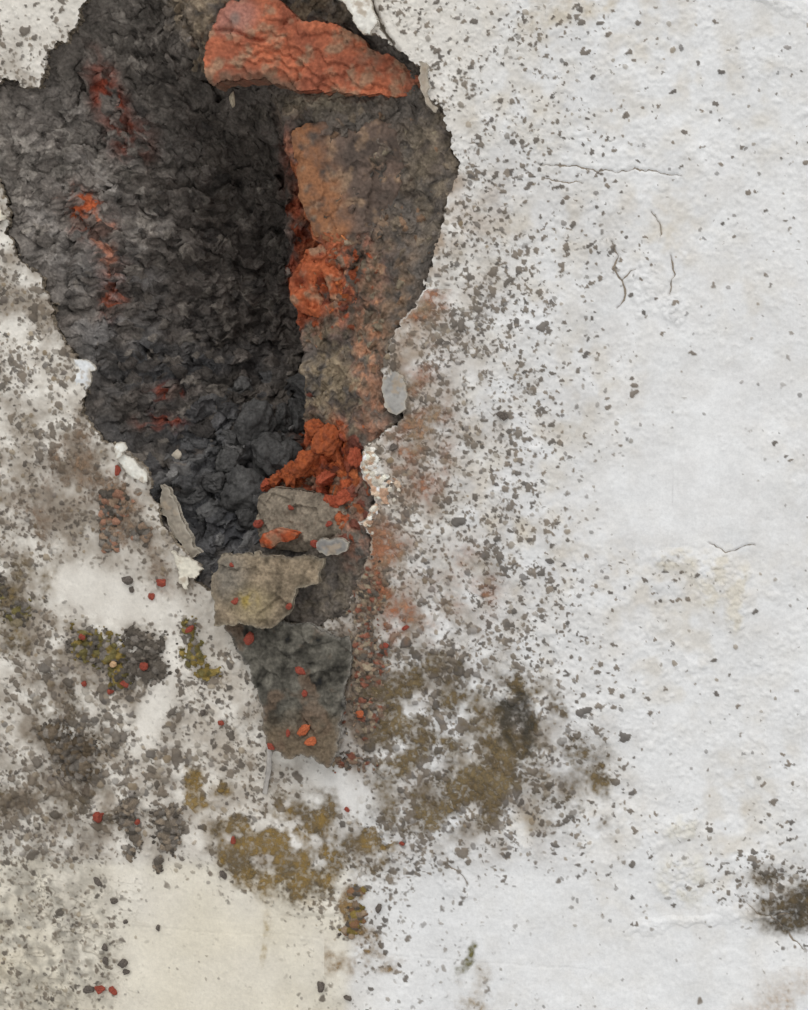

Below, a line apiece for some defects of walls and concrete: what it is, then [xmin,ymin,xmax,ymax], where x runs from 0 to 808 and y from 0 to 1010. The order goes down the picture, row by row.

spalling [0,0,460,794]
water stain [364,659,539,833]
water stain [565,745,610,795]
water stain [339,887,363,921]